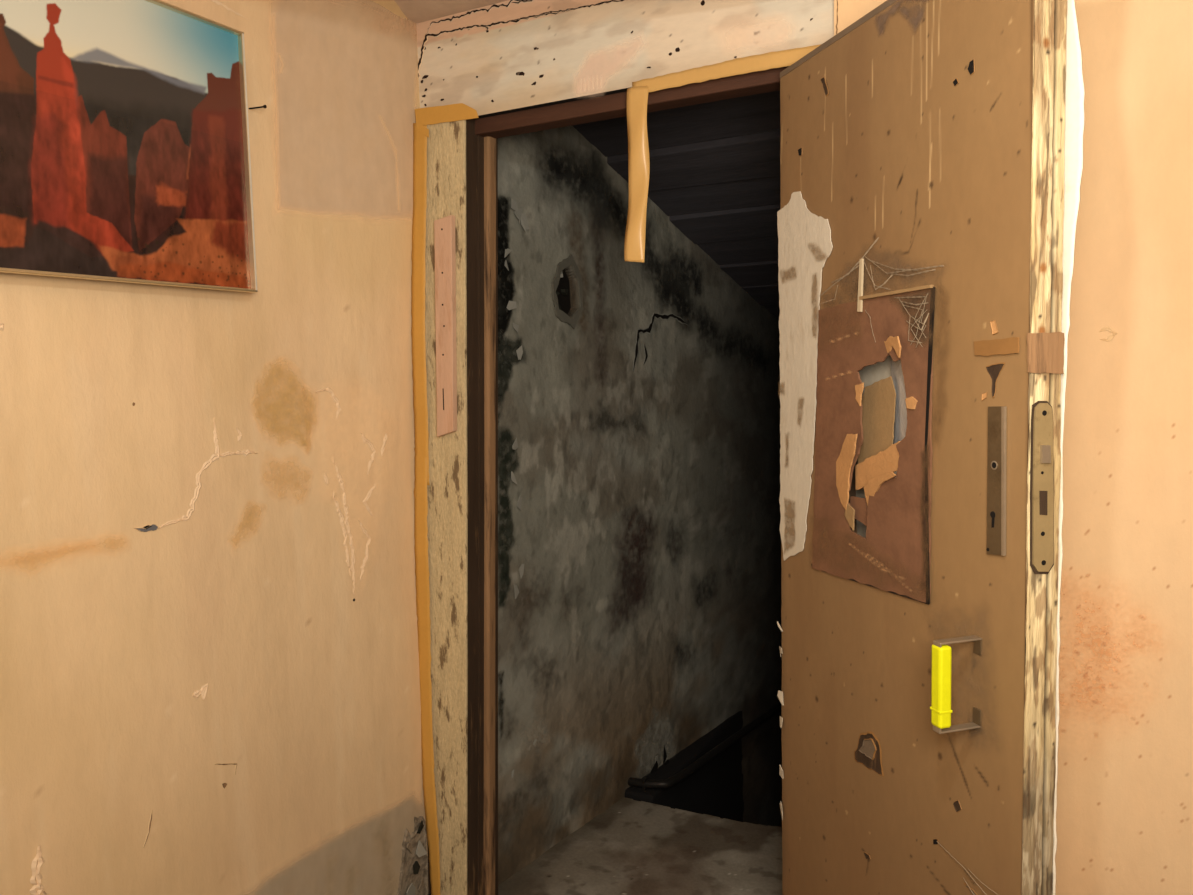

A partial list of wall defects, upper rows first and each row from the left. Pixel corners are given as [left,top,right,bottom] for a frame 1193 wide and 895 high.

crack [418,0,628,79]
damp [254,365,316,447]